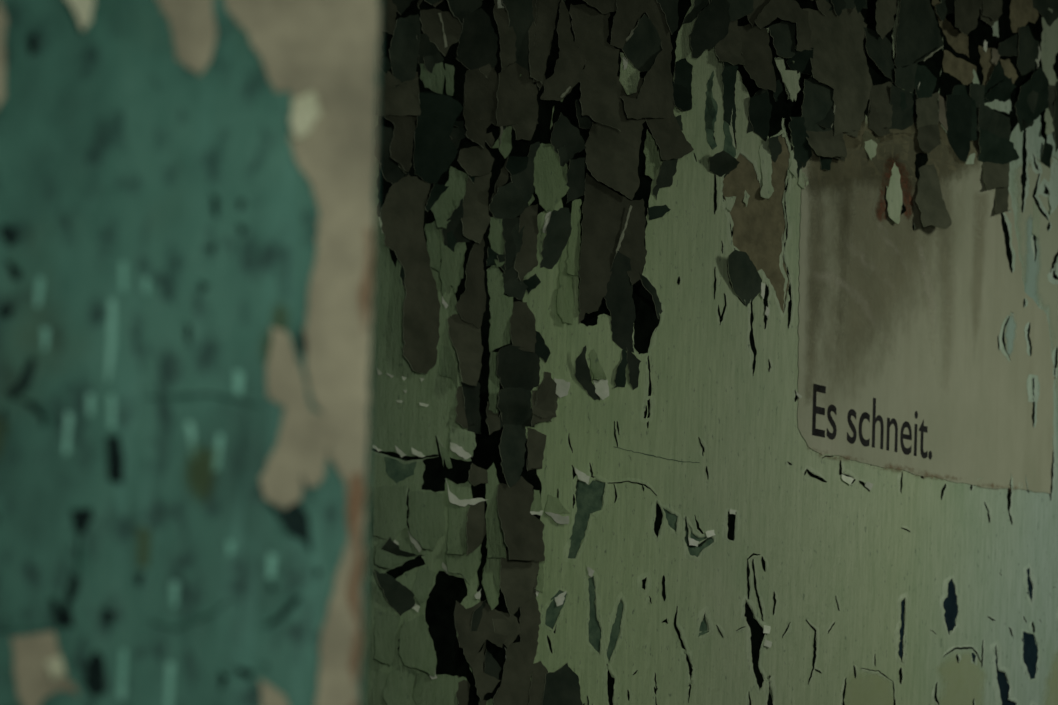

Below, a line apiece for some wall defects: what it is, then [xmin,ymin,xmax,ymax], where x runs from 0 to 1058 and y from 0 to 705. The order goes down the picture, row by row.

peeling [67,0,95,31]
peeling [158,0,218,76]
rust [876,158,913,221]
peeling [0,221,25,284]
water stain [808,123,980,362]
peeling [214,0,1058,705]
peeling [102,430,128,487]
peeling [11,505,110,705]